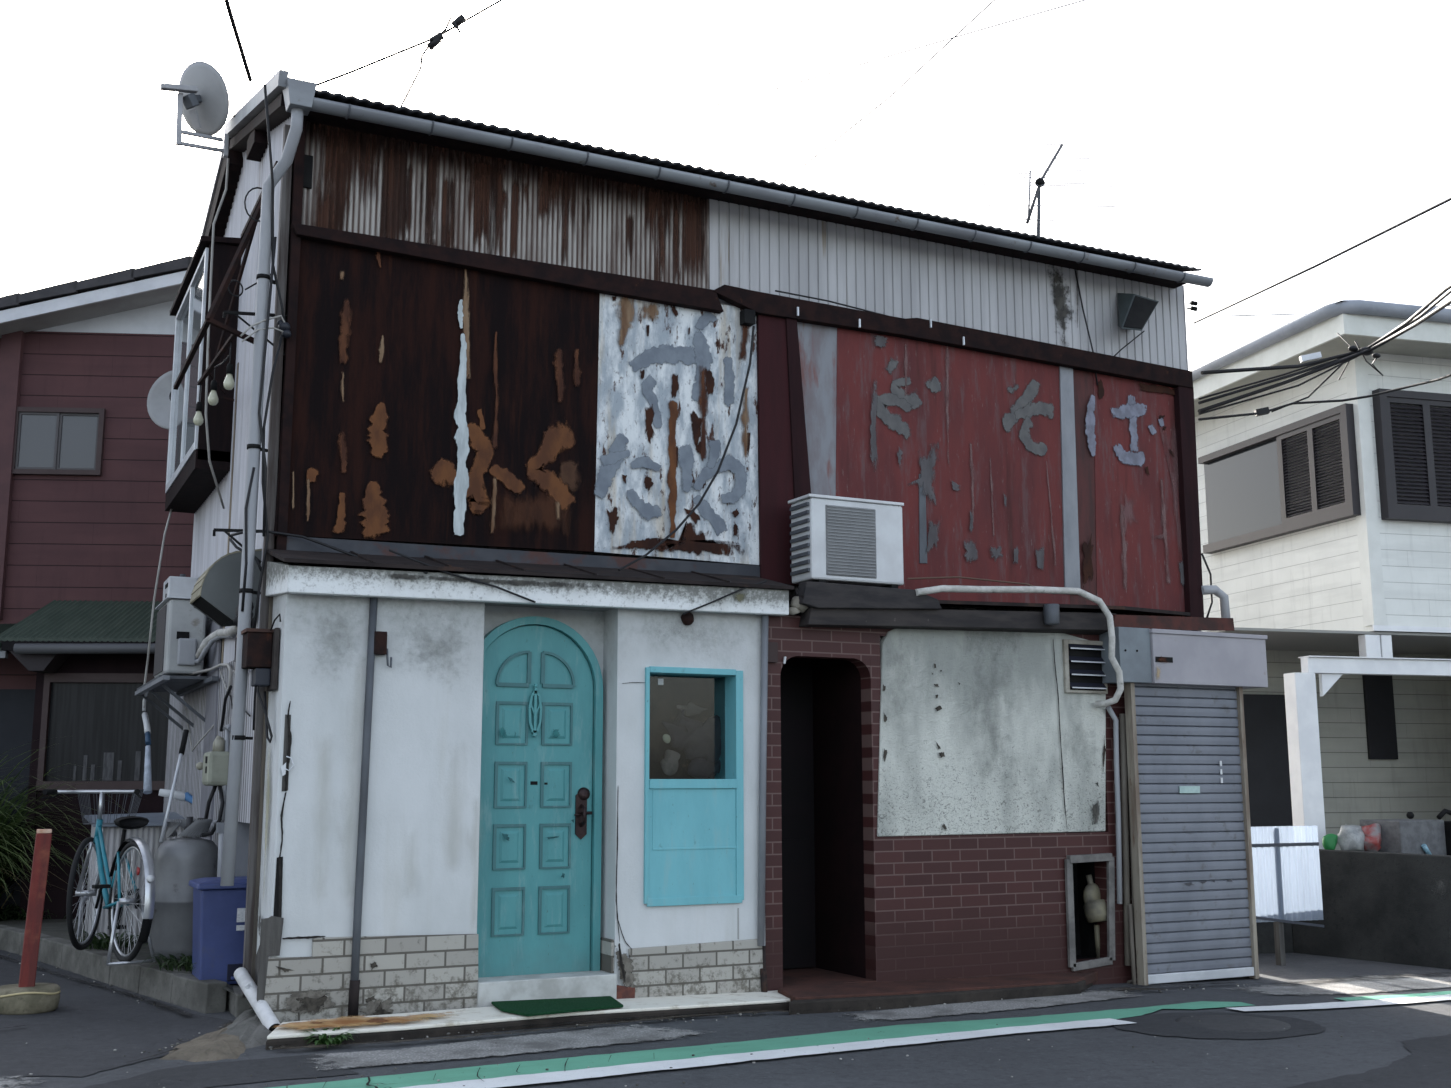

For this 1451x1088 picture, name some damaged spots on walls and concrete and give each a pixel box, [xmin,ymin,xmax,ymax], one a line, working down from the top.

corrosion [308,122,706,281]
corrosion [612,296,690,346]
corrosion [739,325,750,360]
corrosion [741,388,751,457]
peeling [502,461,579,533]
corrosion [607,366,745,556]